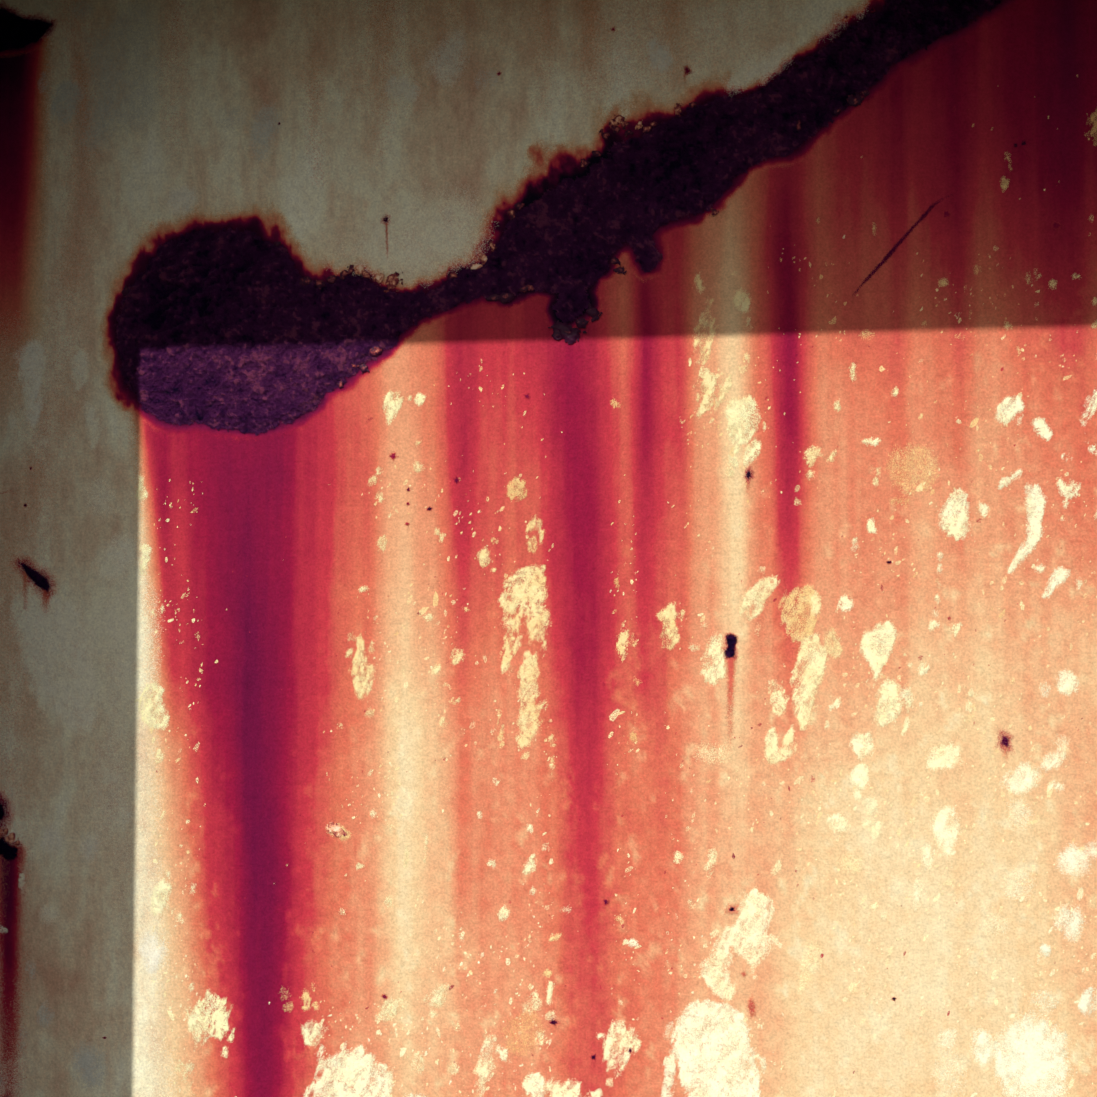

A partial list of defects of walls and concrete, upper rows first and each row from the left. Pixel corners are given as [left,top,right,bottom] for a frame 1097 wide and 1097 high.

rust [0,0,59,438]
rust [380,215,391,258]
peeling [1079,389,1097,426]
peeling [477,537,498,572]
peeling [497,515,552,760]
peeling [739,566,843,765]
rust [0,784,33,1097]
peeling [174,982,235,1095]
peeling [279,983,426,1097]
peeling [660,886,785,1097]